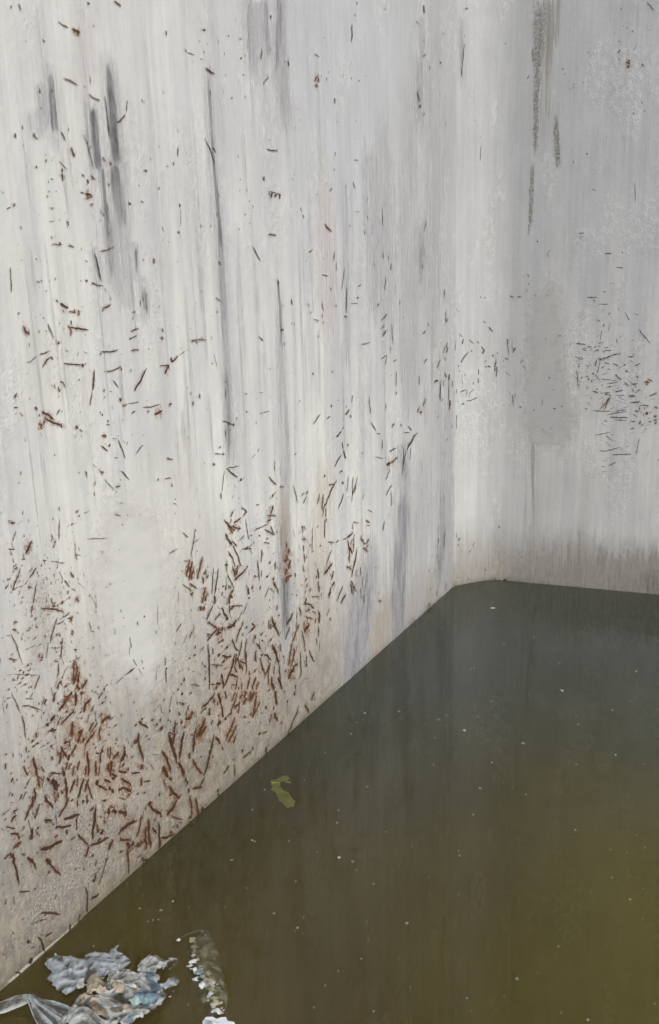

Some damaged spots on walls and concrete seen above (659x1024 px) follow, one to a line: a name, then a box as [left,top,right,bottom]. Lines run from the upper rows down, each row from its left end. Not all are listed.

leakage [90,67,137,277]
rust [18,280,172,496]
rust [424,334,525,441]
rust [573,283,657,478]
rust [0,396,372,931]
rust [13,895,61,974]